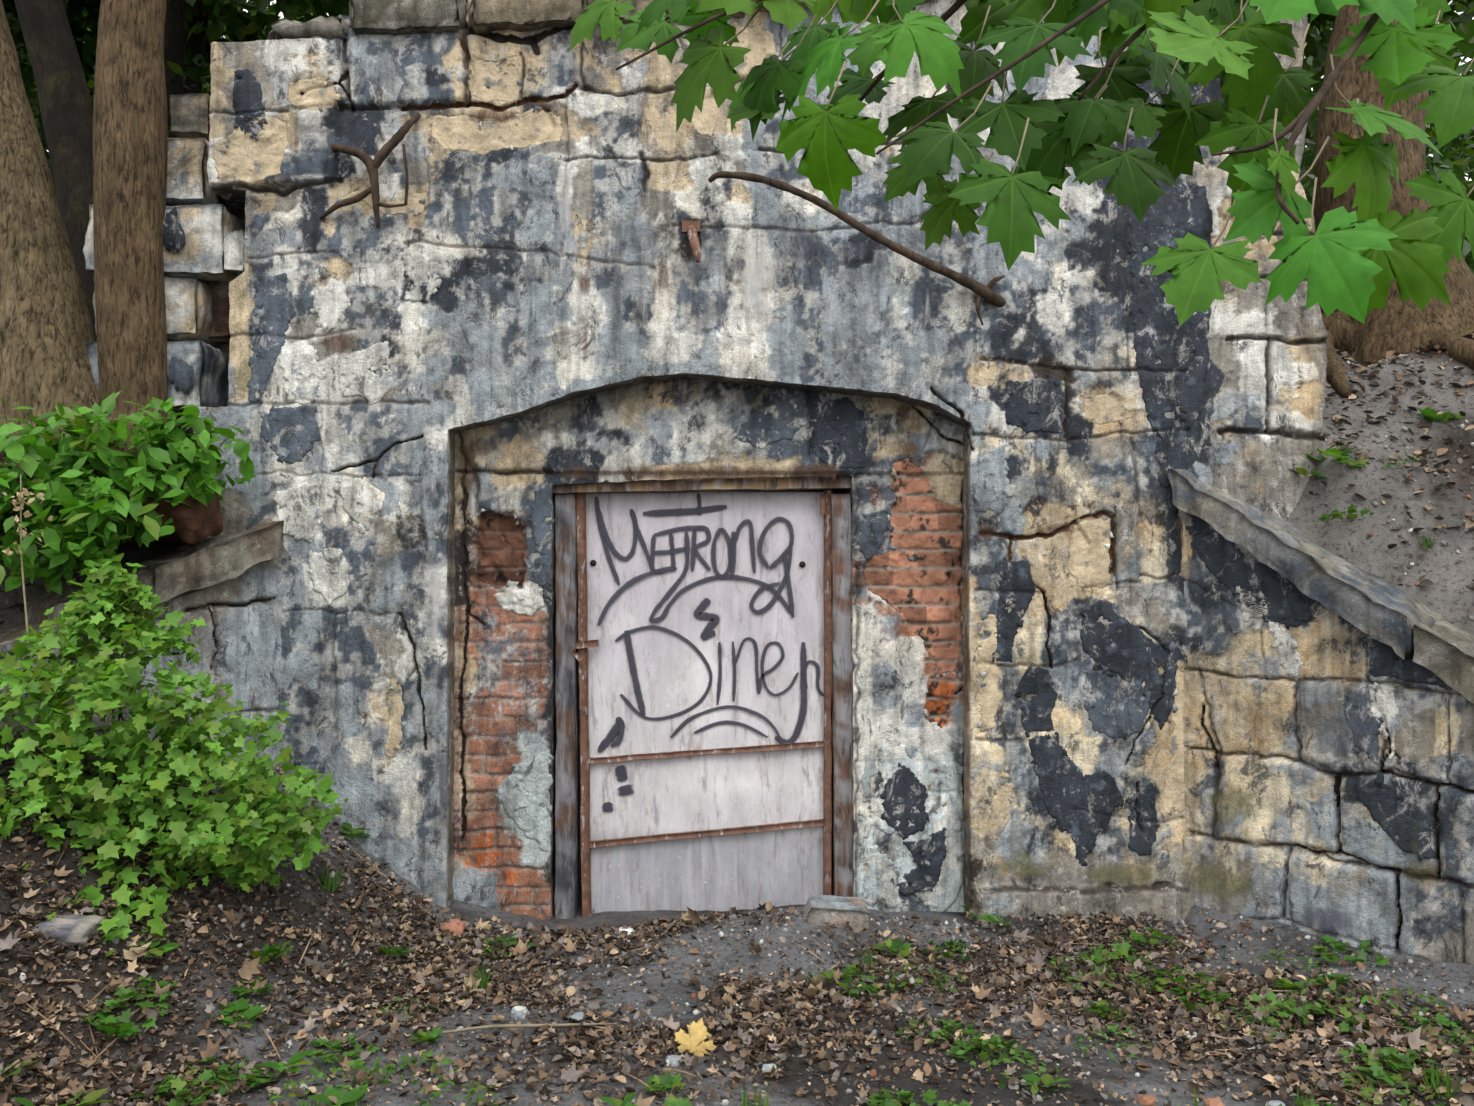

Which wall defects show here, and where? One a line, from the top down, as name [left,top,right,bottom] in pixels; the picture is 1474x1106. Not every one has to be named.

peeling [1084,177,1213,491]
crack [333,435,424,478]
peeling [1005,374,1064,434]
spalling [477,486,555,616]
crack [403,462,485,841]
spalling [857,443,1191,866]
peeling [495,749,554,852]
crack [1126,627,1169,813]
crack [1201,705,1219,769]